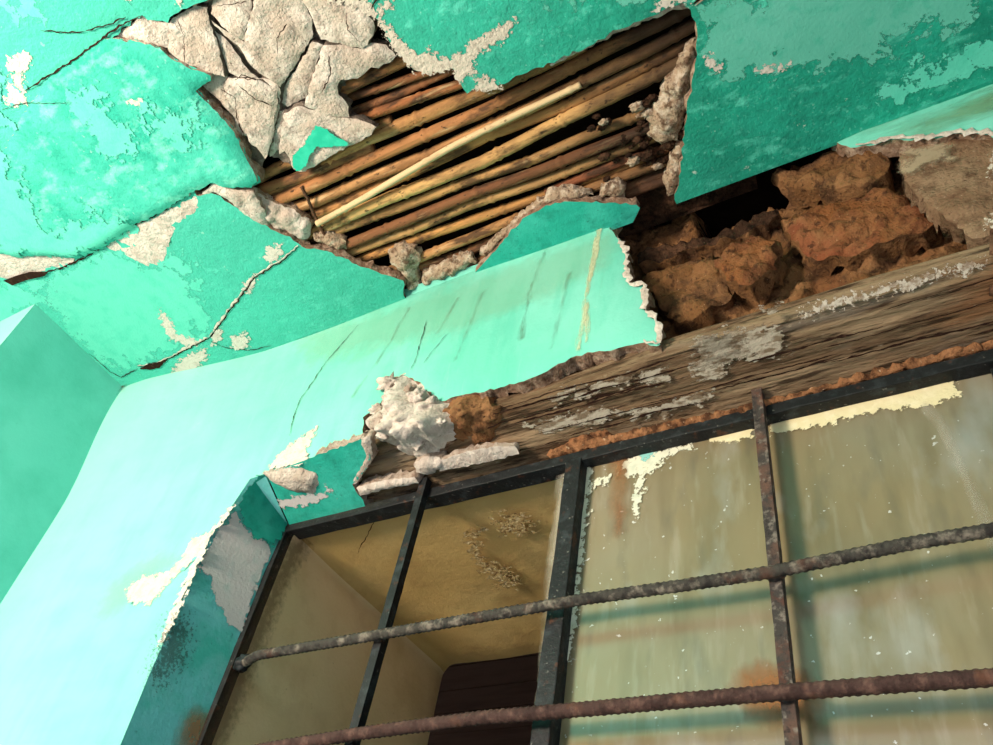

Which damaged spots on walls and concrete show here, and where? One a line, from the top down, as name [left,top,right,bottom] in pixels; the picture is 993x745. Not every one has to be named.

crack [3,0,141,110]
crack [47,183,215,272]
peeling [0,151,348,375]
crack [91,245,298,378]
spalling [353,371,520,496]
rust [547,403,753,459]
spalling [388,0,993,344]
rust [763,340,993,406]
peeling [124,425,333,647]
spalling [242,522,993,667]
rust [743,669,779,687]
rust [750,701,782,720]